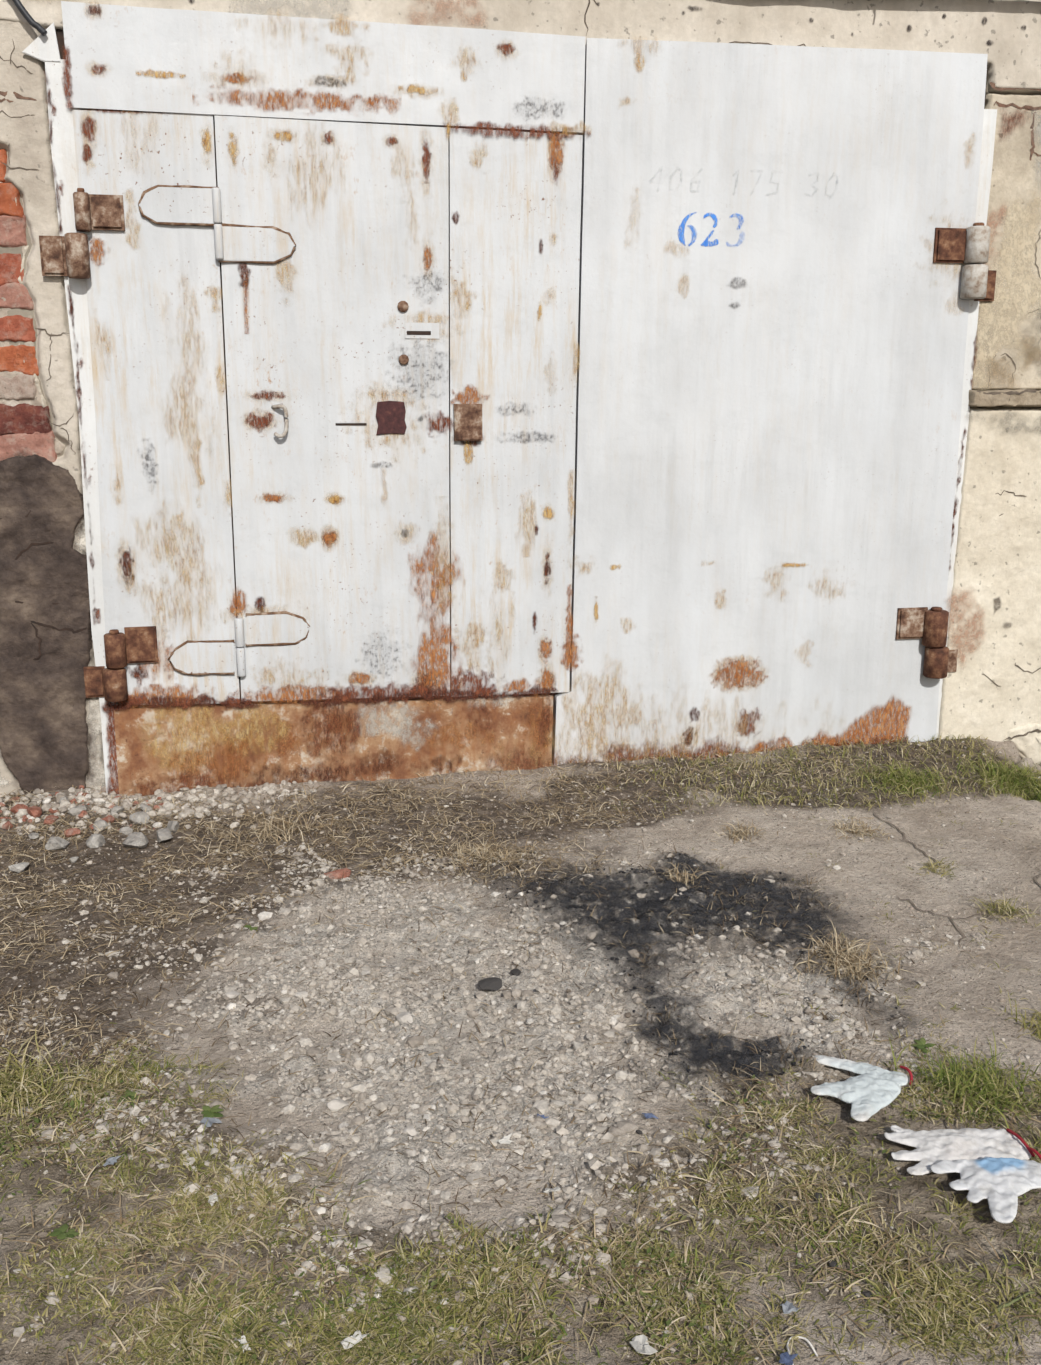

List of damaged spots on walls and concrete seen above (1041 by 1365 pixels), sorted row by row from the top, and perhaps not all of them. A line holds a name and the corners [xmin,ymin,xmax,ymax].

crack [0,42,38,170]
corrosion [137,70,185,78]
corrosion [225,56,425,110]
corrosion [447,104,591,178]
flaking render [0,149,65,462]
corrosion [89,239,104,264]
crack [977,230,1041,395]
leakage [0,453,93,794]
corrosion [102,535,910,794]